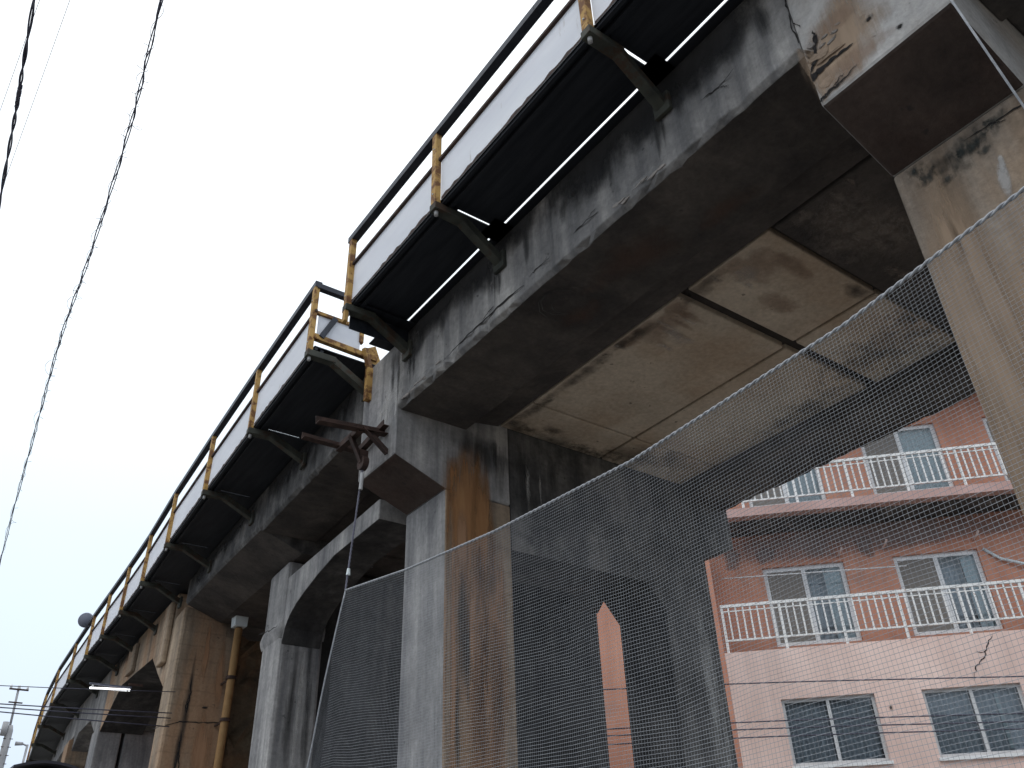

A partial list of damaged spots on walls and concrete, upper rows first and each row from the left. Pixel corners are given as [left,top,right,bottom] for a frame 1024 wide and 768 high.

spalling [804,0,875,95]
leakage [912,139,988,183]
crack [964,103,1024,141]
corrosion [445,452,507,768]
crack [151,680,219,768]